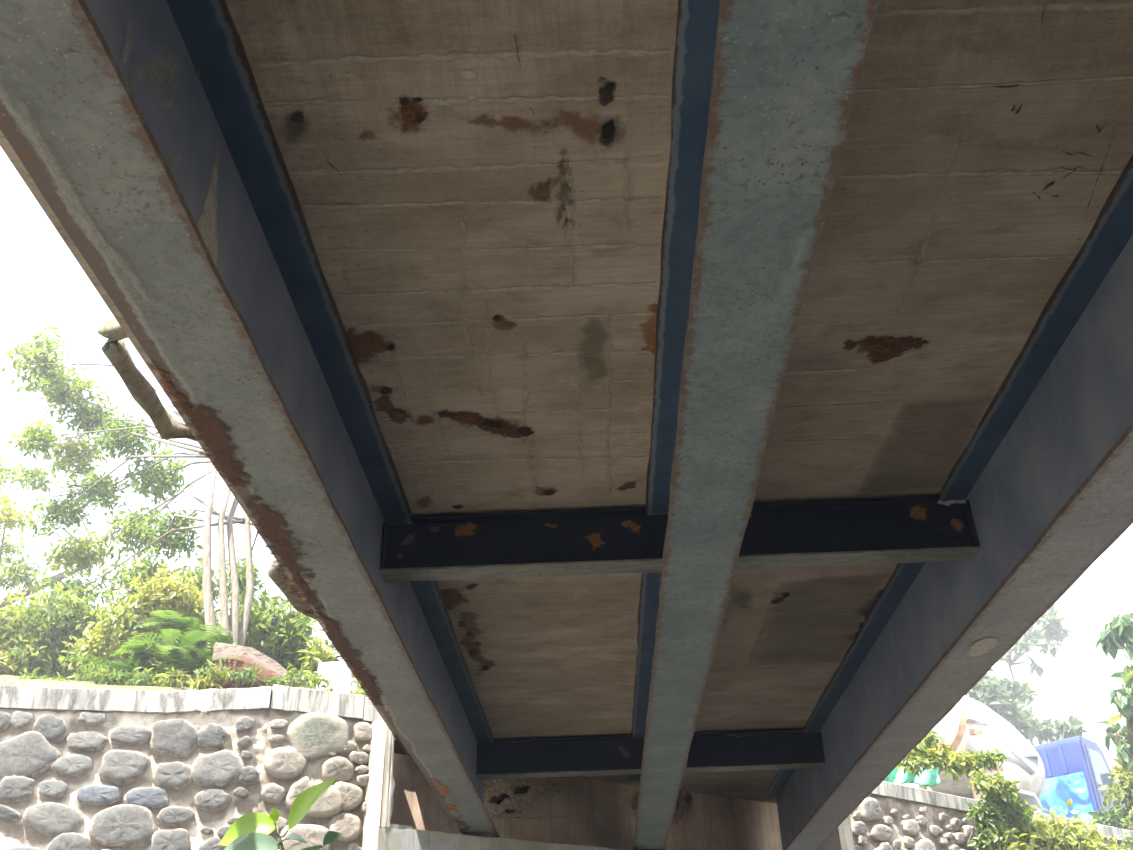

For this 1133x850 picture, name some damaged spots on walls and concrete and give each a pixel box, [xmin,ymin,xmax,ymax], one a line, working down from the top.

corrosion [396,98,427,132]
corrosion [470,112,601,143]
corrosion [348,328,396,363]
corrosion [642,304,657,354]
corrosion [148,364,385,706]
corrosion [439,584,479,609]